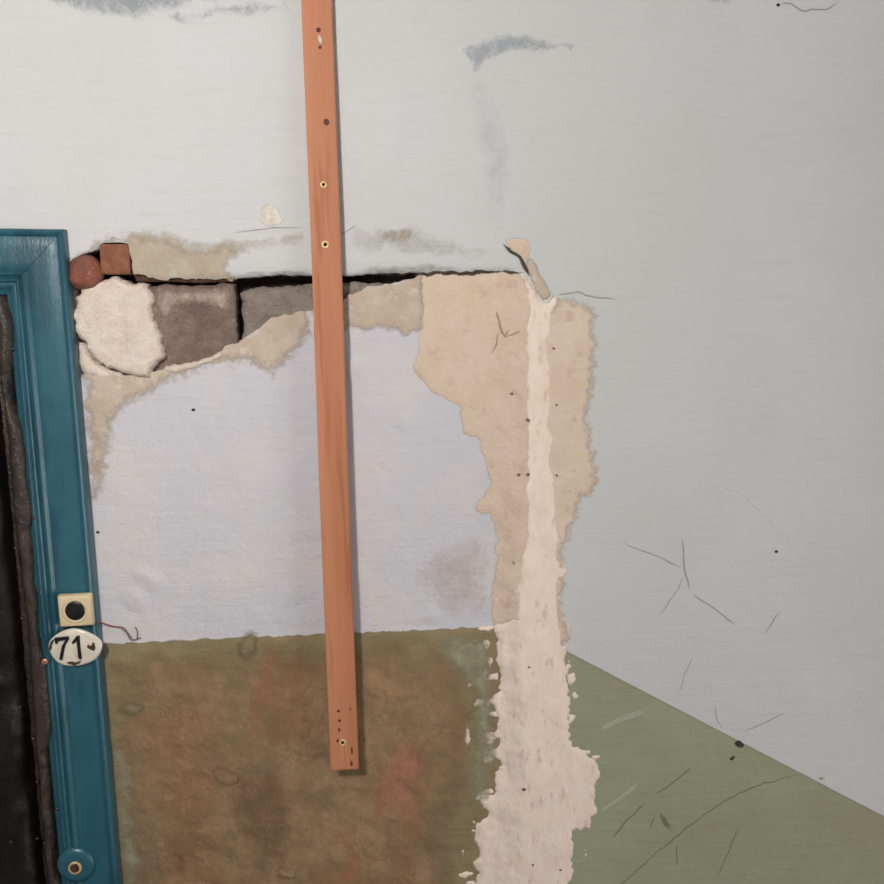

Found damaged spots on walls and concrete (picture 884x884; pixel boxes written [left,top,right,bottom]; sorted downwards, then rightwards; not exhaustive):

crack [415,269,523,277]
spalling [82,234,313,484]
peeling [342,238,598,625]
peeling [555,578,570,646]
crack [613,769,690,837]
crack [621,776,790,884]